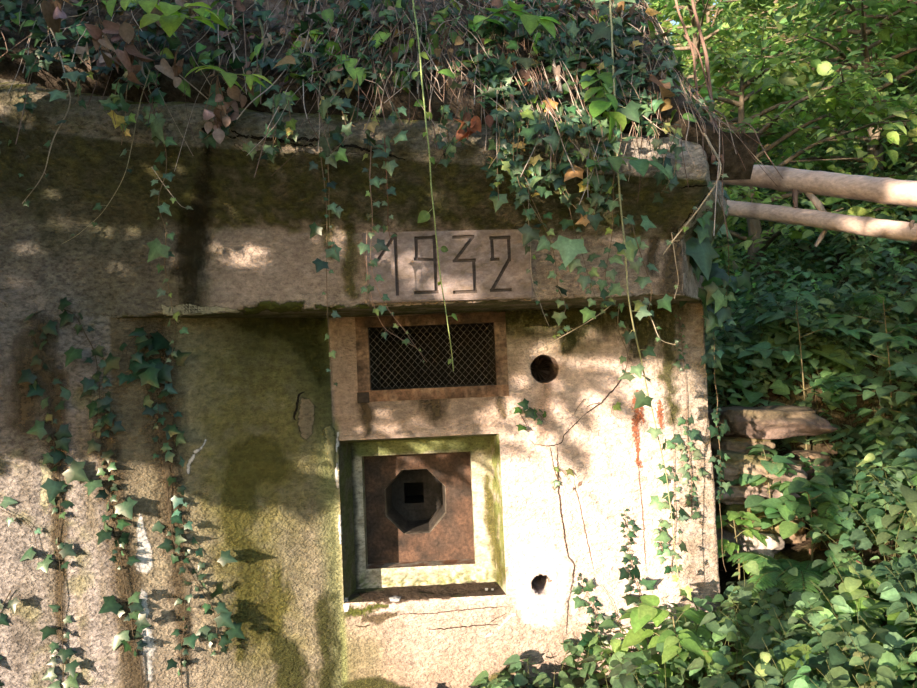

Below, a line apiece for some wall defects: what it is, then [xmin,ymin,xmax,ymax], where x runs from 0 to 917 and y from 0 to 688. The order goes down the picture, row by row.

damp [173,132,215,313]
spalling [298,397,315,440]
rust [631,390,645,468]
rust [656,400,664,429]
damp [138,319,192,666]
crack [532,368,626,634]
damp [226,543,289,661]